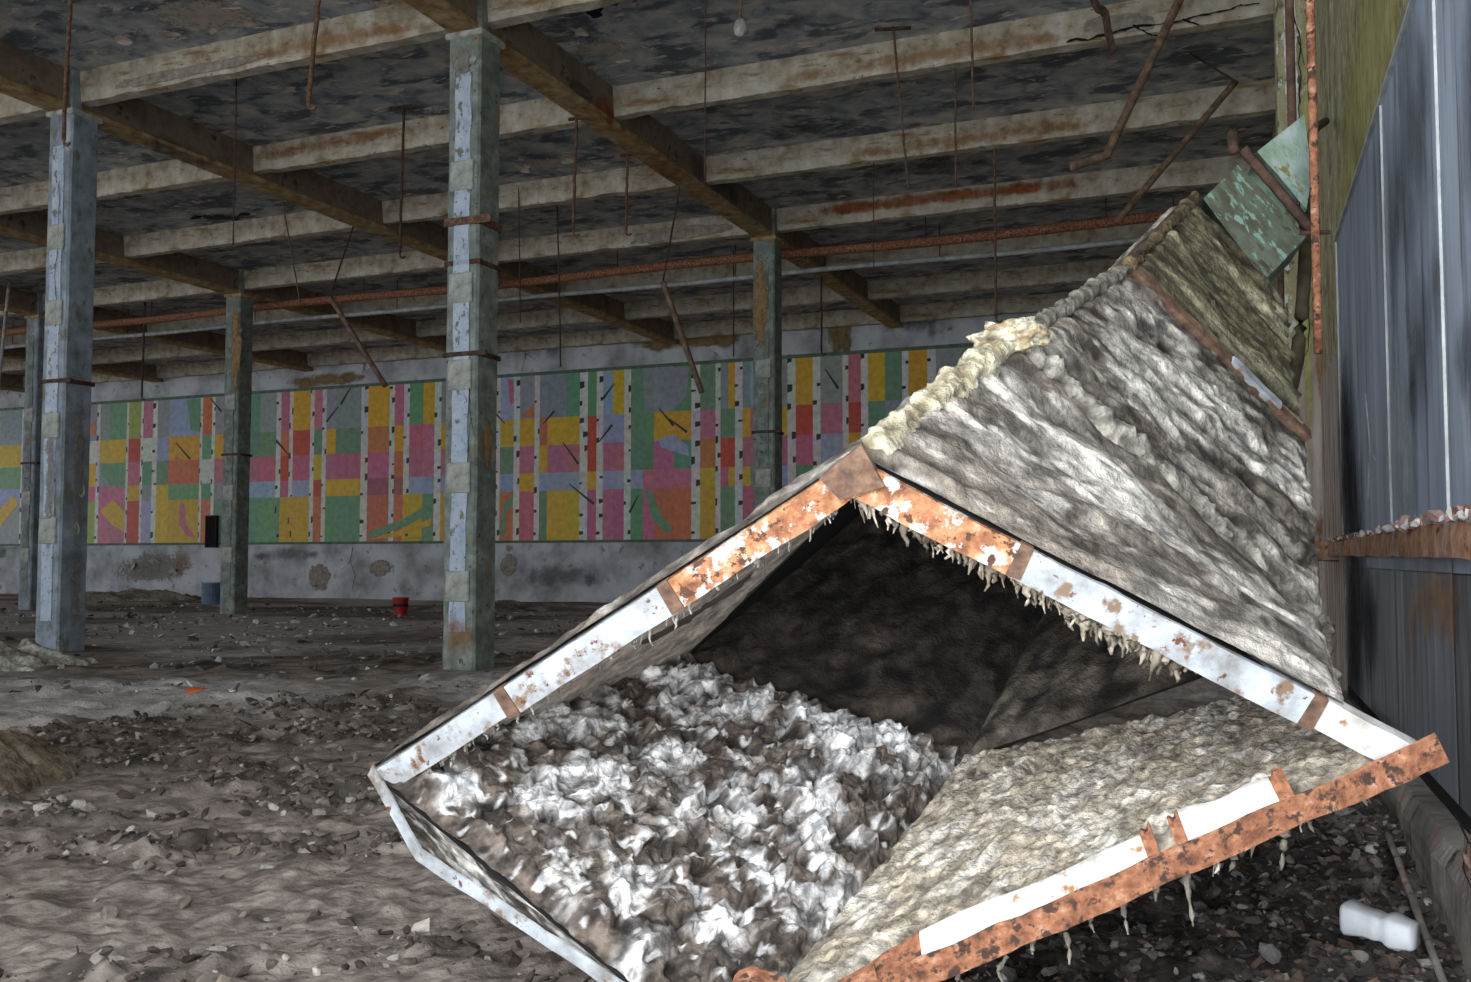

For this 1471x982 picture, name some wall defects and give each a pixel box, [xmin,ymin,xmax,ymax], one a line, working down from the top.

crack [1066,3,1259,43]
crack [1294,16,1305,119]
corrosion [834,183,1059,214]
water stain [1303,301,1312,426]